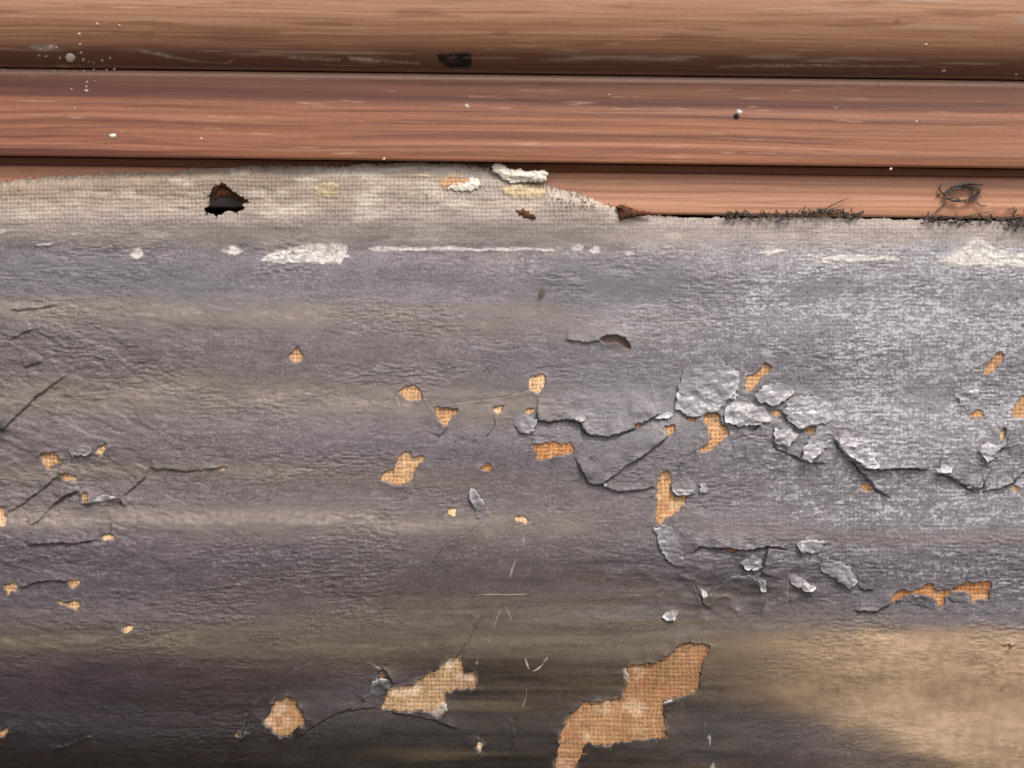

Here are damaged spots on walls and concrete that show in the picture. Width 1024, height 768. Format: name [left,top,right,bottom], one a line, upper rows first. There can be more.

crack [6,363,68,428]
peeling [513,408,574,460]
peeling [655,355,879,469]
peeling [381,448,425,485]
crack [18,469,214,546]
peeling [654,470,708,567]
peeling [728,549,767,592]
peeling [788,574,816,593]
peeling [796,536,858,589]
peeling [265,696,305,736]
peeling [362,656,478,718]
peeling [555,641,710,768]